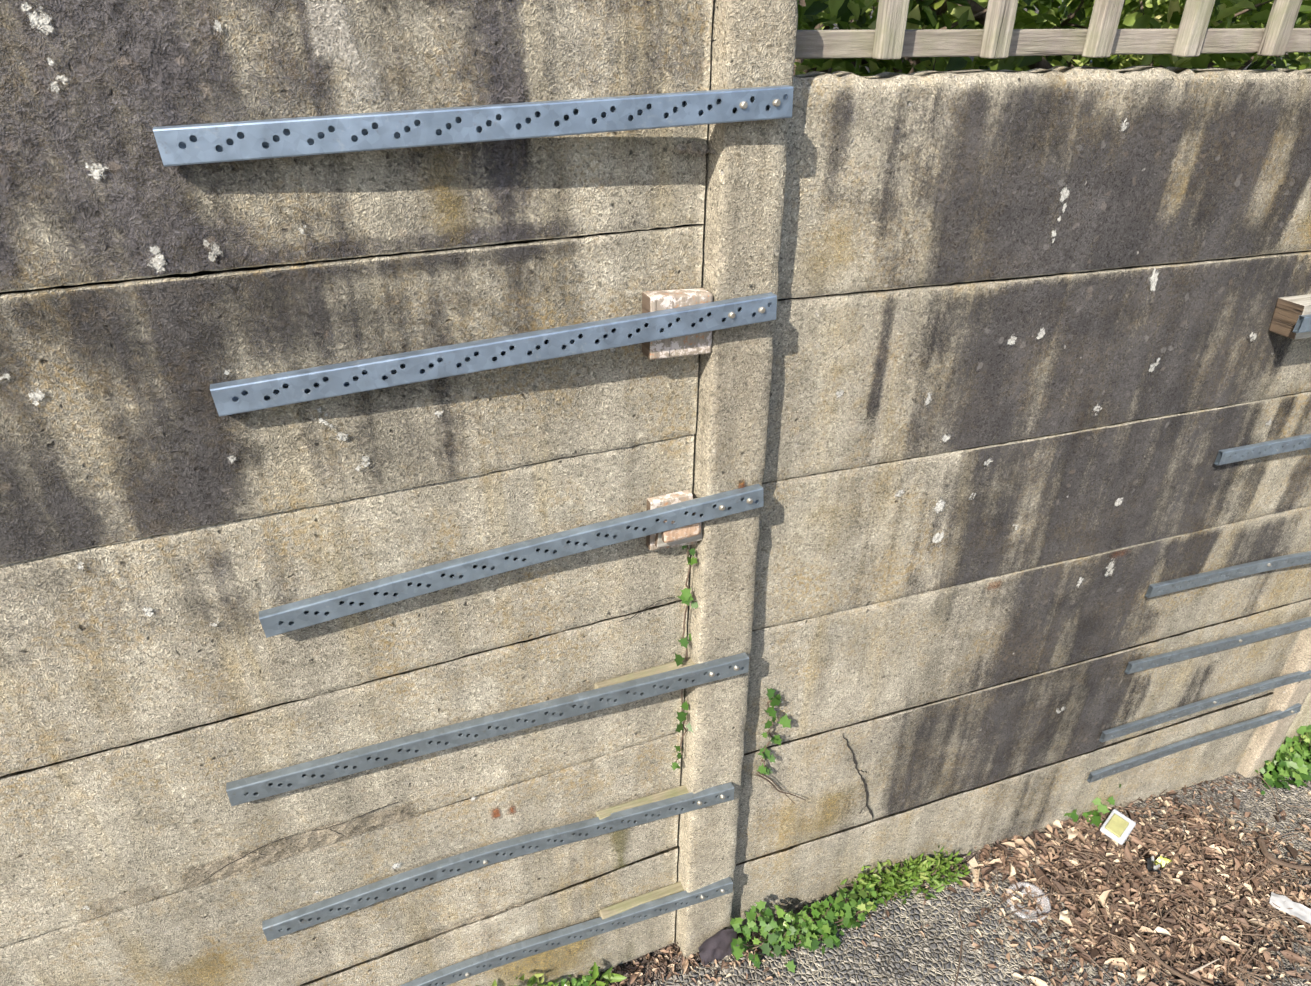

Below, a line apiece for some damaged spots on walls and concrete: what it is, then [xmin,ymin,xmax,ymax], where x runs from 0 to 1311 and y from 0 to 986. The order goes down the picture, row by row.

water stain [828,92,854,201]
water stain [0,0,580,630]
water stain [868,80,1311,840]
crack [843,735,873,819]
crack [198,801,402,884]